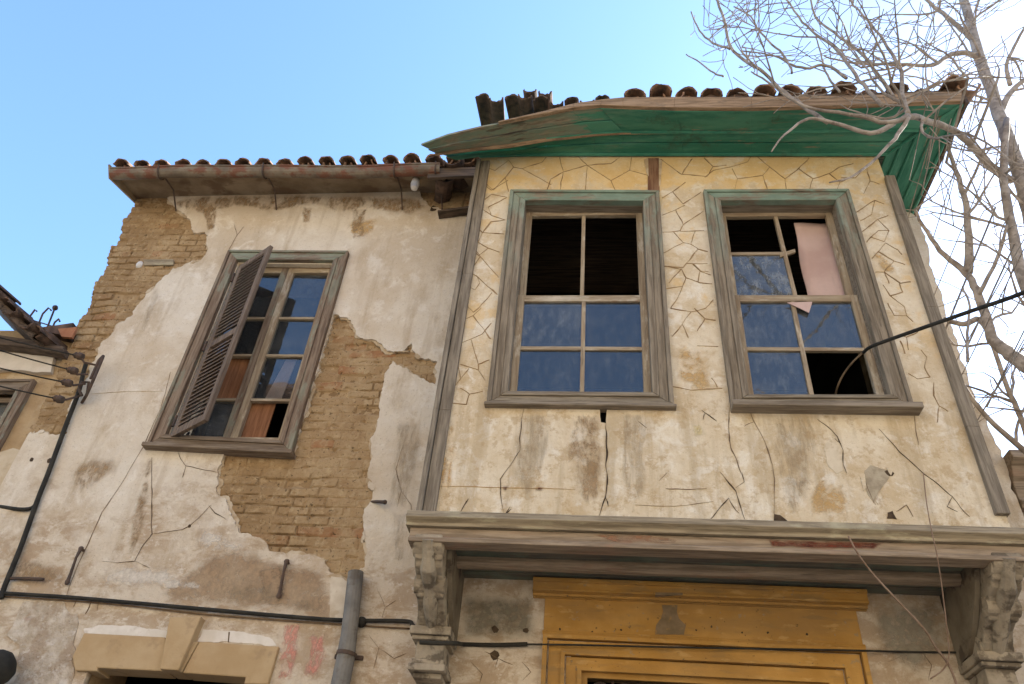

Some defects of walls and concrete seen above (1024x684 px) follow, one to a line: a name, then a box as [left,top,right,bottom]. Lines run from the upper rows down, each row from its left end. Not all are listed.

flaking render [31,198,208,435]
crack [67,375,224,614]
flaking render [216,315,437,579]
crack [453,410,575,513]
crack [599,425,608,515]
crack [644,408,775,519]
crack [817,419,913,516]
spalling [860,465,896,519]
crack [879,416,970,517]